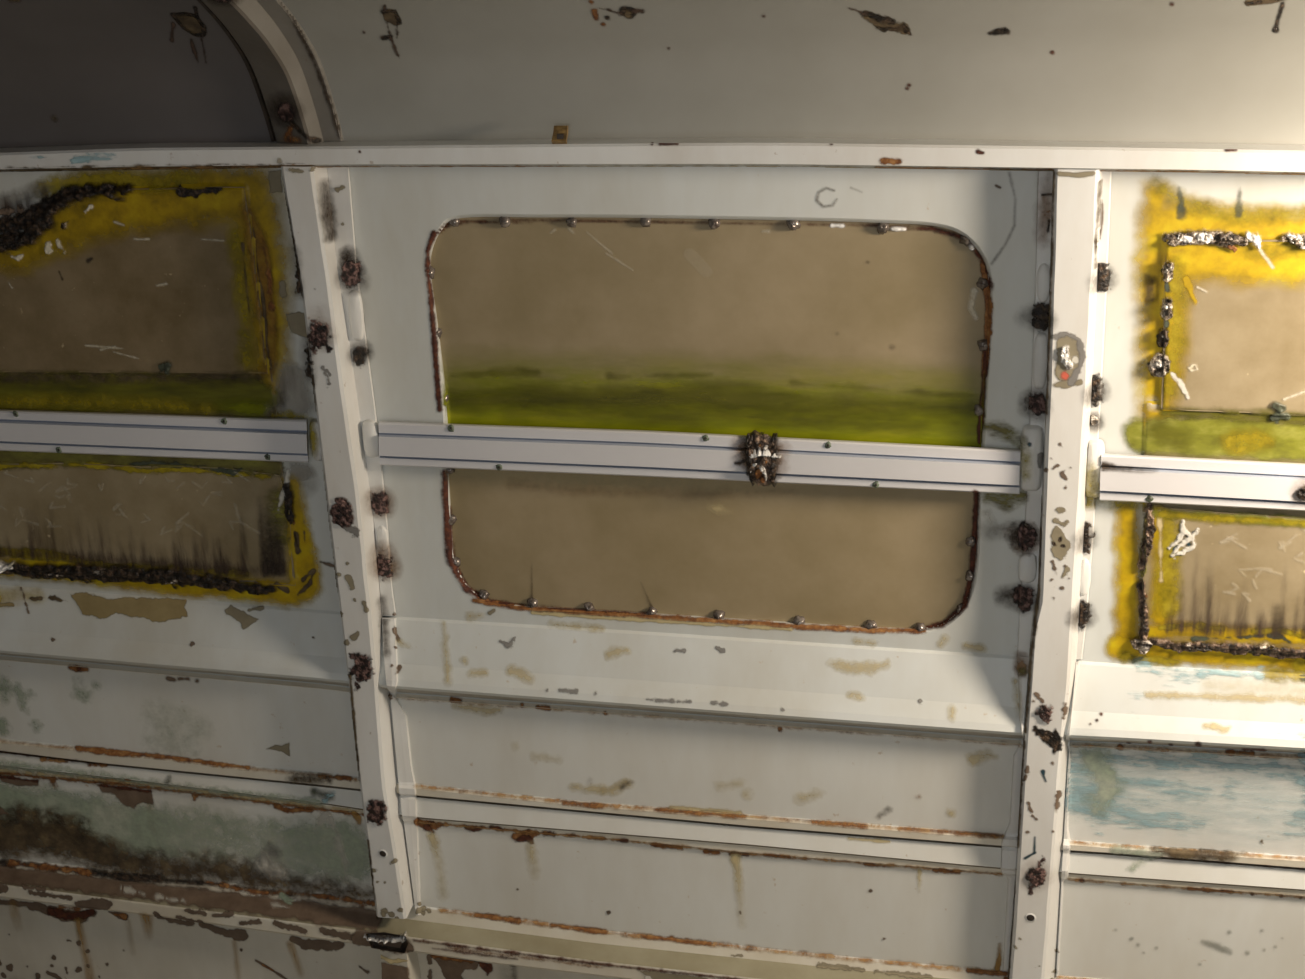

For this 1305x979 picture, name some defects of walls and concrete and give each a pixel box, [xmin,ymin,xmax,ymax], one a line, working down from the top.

peeling [0,587,187,622]
rust [0,743,364,825]
water stain [0,762,370,880]
rust [414,818,1002,884]
peeling [0,859,431,952]
peeling [0,940,109,979]
peeling [359,955,410,979]
peeling [427,954,493,979]
peeling [640,971,707,979]
rust [413,909,1008,979]